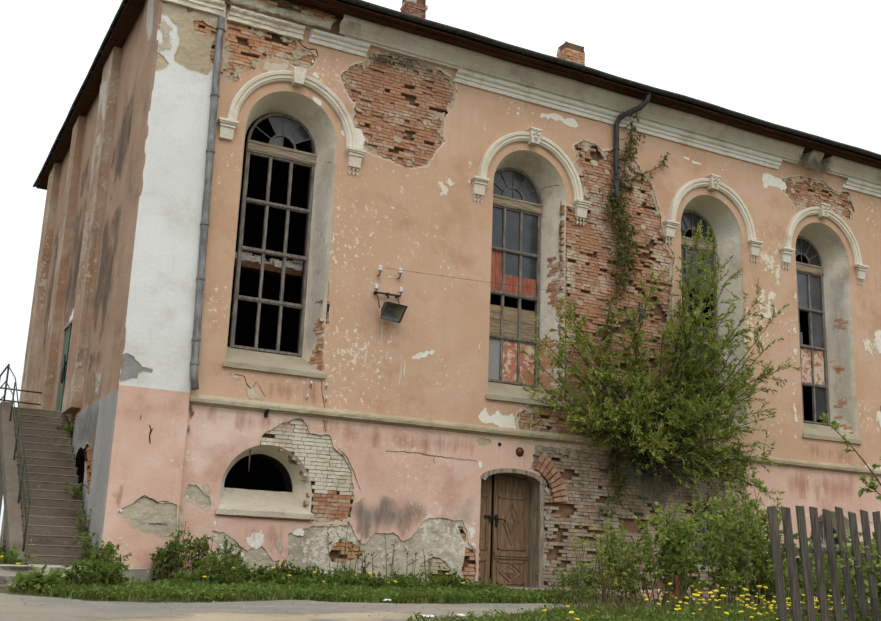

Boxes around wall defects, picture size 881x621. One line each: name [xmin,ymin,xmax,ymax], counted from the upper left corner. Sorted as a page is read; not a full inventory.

spalling [155,2,319,84]
spalling [225,0,345,36]
damp [97,74,109,119]
damp [112,117,131,176]
spalling [339,52,458,174]
damp [66,232,83,301]
damp [95,212,118,325]
peeling [120,322,153,382]
spalling [476,140,755,599]
peeling [860,330,881,357]
peeling [116,483,214,539]
peeling [212,417,482,585]